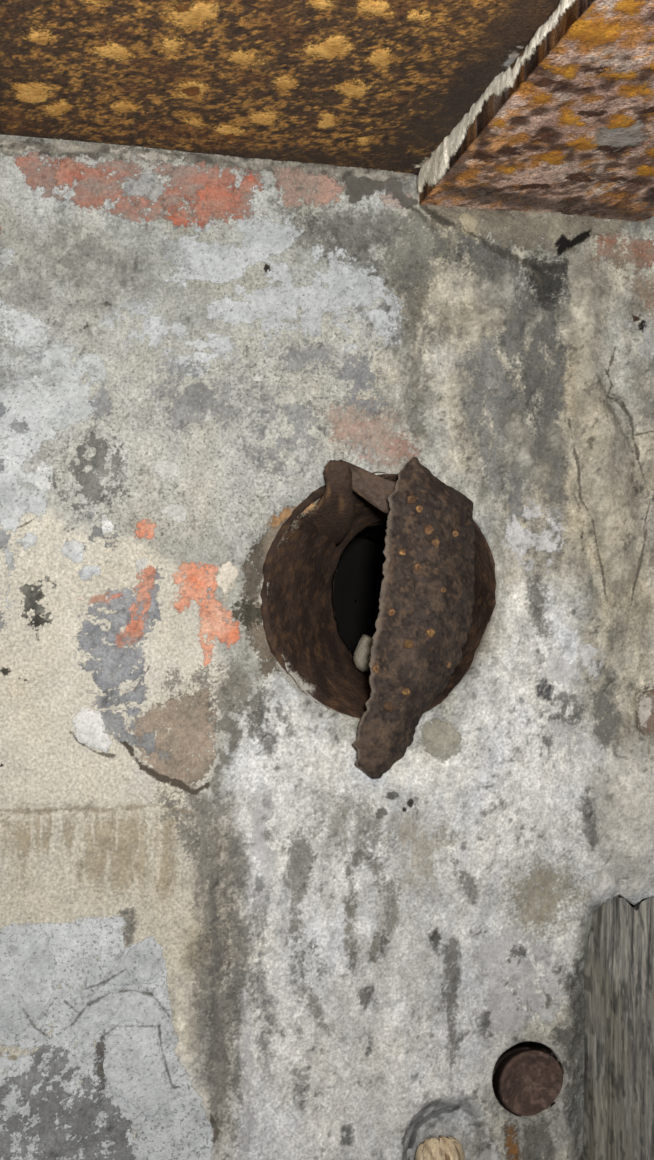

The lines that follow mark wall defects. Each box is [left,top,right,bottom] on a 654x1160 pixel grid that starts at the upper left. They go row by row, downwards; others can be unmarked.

rust [12,82,72,116]
rust [159,0,218,53]
rust [305,35,353,60]
rust [473,63,654,191]
peeling [0,136,654,467]
crack [568,348,654,605]
spalling [71,498,320,860]
water stain [317,801,455,969]
peeling [0,915,214,1160]
water stain [398,1095,554,1160]
water stain [429,864,588,1160]
spalling [492,1041,564,1117]